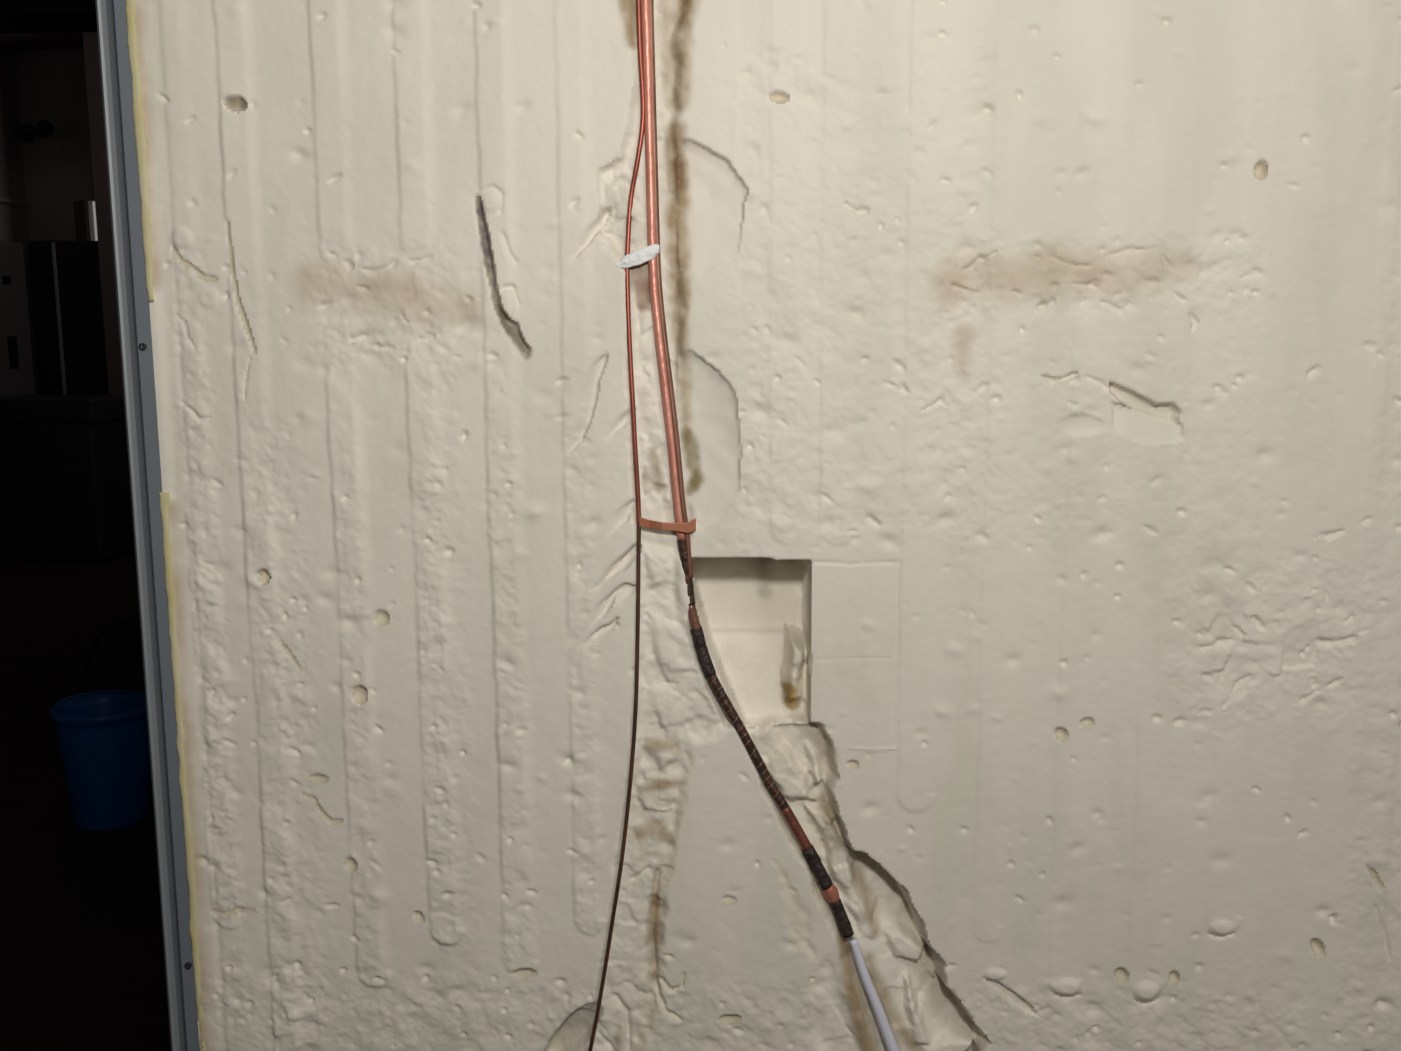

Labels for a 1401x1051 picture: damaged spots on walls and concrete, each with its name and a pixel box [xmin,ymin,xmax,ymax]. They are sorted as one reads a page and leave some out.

leakage [675,0,690,66]
leakage [669,125,687,301]
spalling [1109,382,1185,447]
leakage [684,431,701,489]
spalling [546,0,991,1051]
spalling [512,968,538,979]